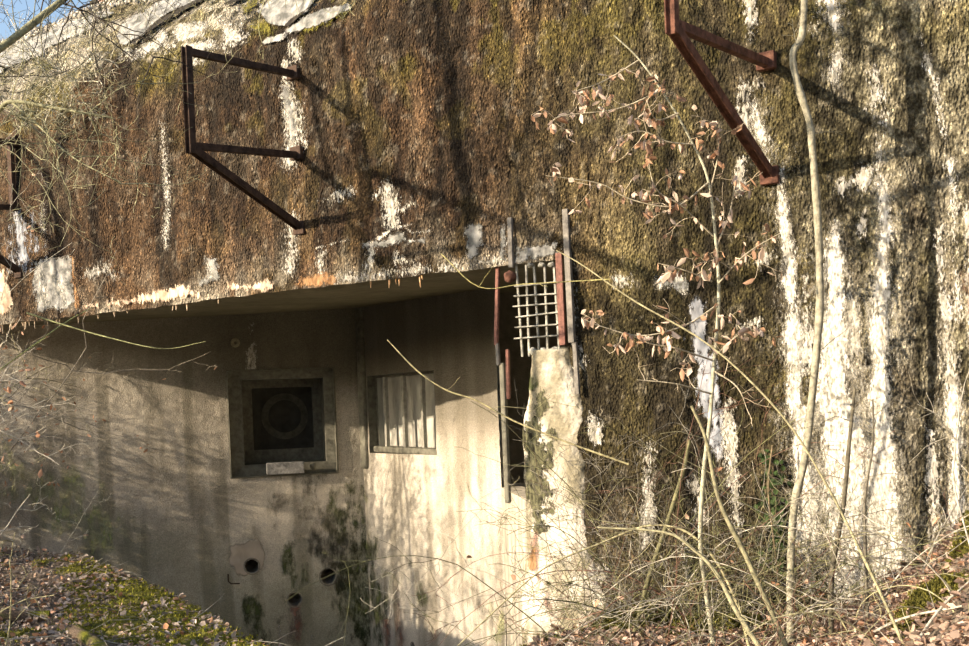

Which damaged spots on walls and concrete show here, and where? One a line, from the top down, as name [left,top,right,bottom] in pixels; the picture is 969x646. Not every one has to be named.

peeling [0,10,114,73]
spalling [116,0,350,66]
efflorescence [741,0,762,41]
efflorescence [279,40,308,171]
efflorescence [735,77,772,162]
efflorescence [374,178,416,230]
efflorescence [733,156,748,196]
efflorescence [282,211,300,277]
damp [314,247,506,285]
efflorescence [776,64,907,608]
efflorescence [923,157,969,544]
damp [685,299,744,538]